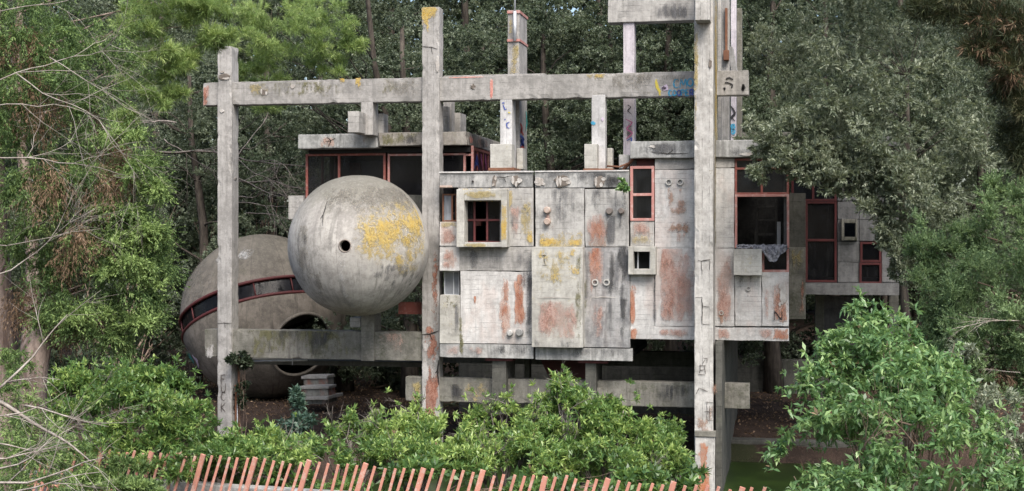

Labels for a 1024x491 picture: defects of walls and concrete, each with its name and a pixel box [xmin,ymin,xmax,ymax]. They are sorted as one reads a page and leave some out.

corrosion [587,216,605,291]
corrosion [499,274,526,332]
corrosion [660,249,689,335]
corrosion [717,262,731,338]
corrosion [761,286,788,340]